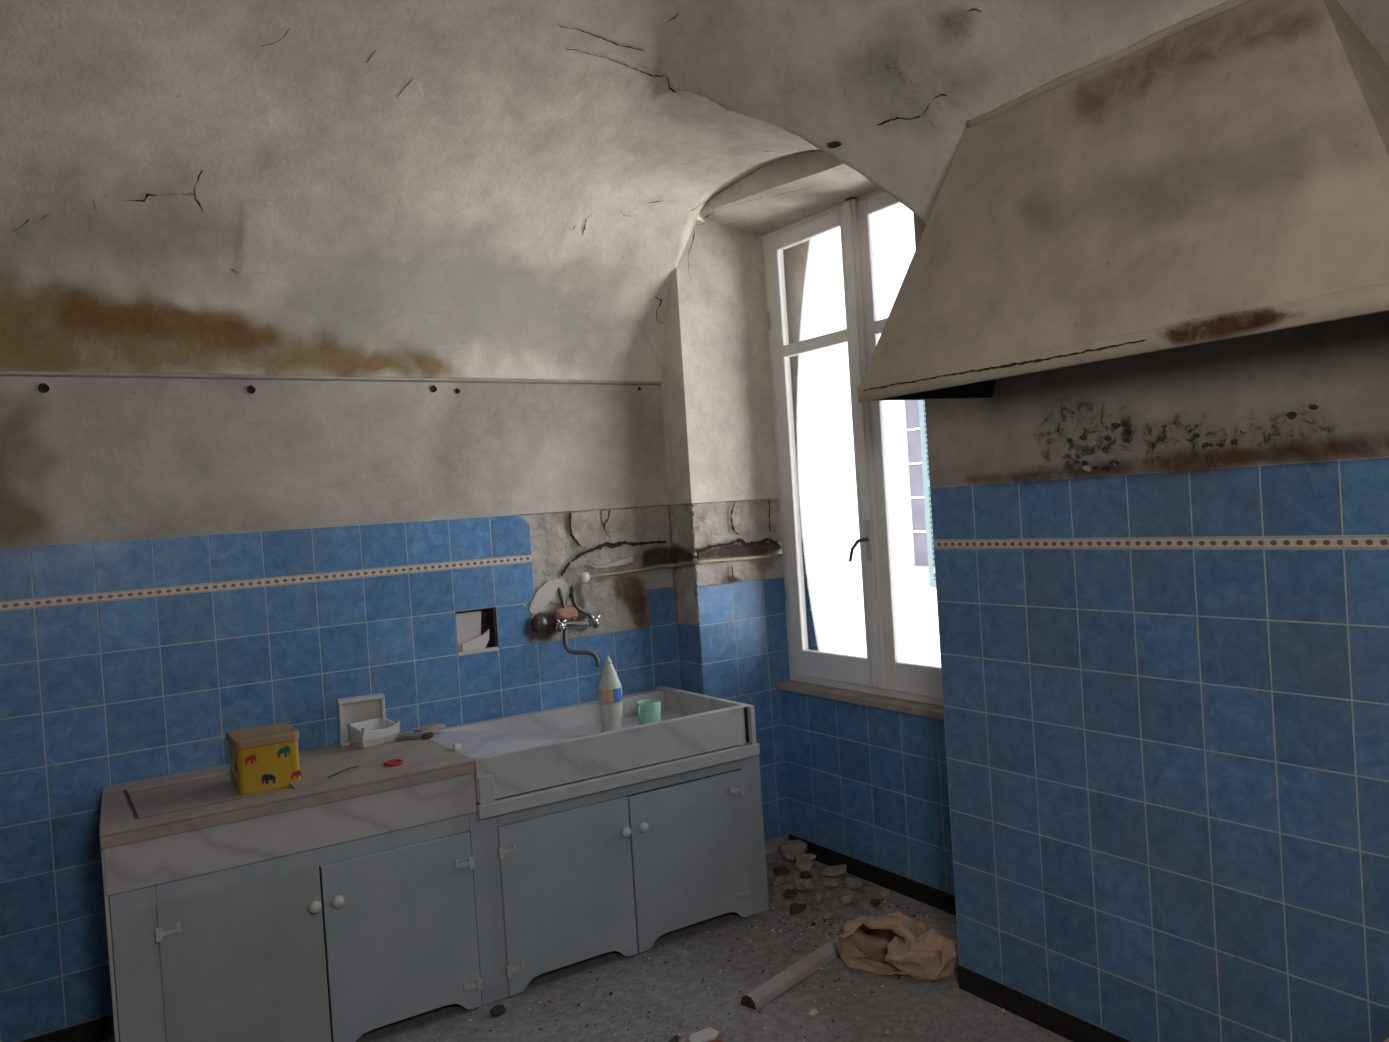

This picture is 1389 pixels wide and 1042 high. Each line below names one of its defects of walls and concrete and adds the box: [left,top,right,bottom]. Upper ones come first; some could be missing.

crack [558,25,683,95]
crack [93,170,204,213]
leakage [0,289,447,378]
spalling [517,498,784,643]
spalling [458,647,498,656]